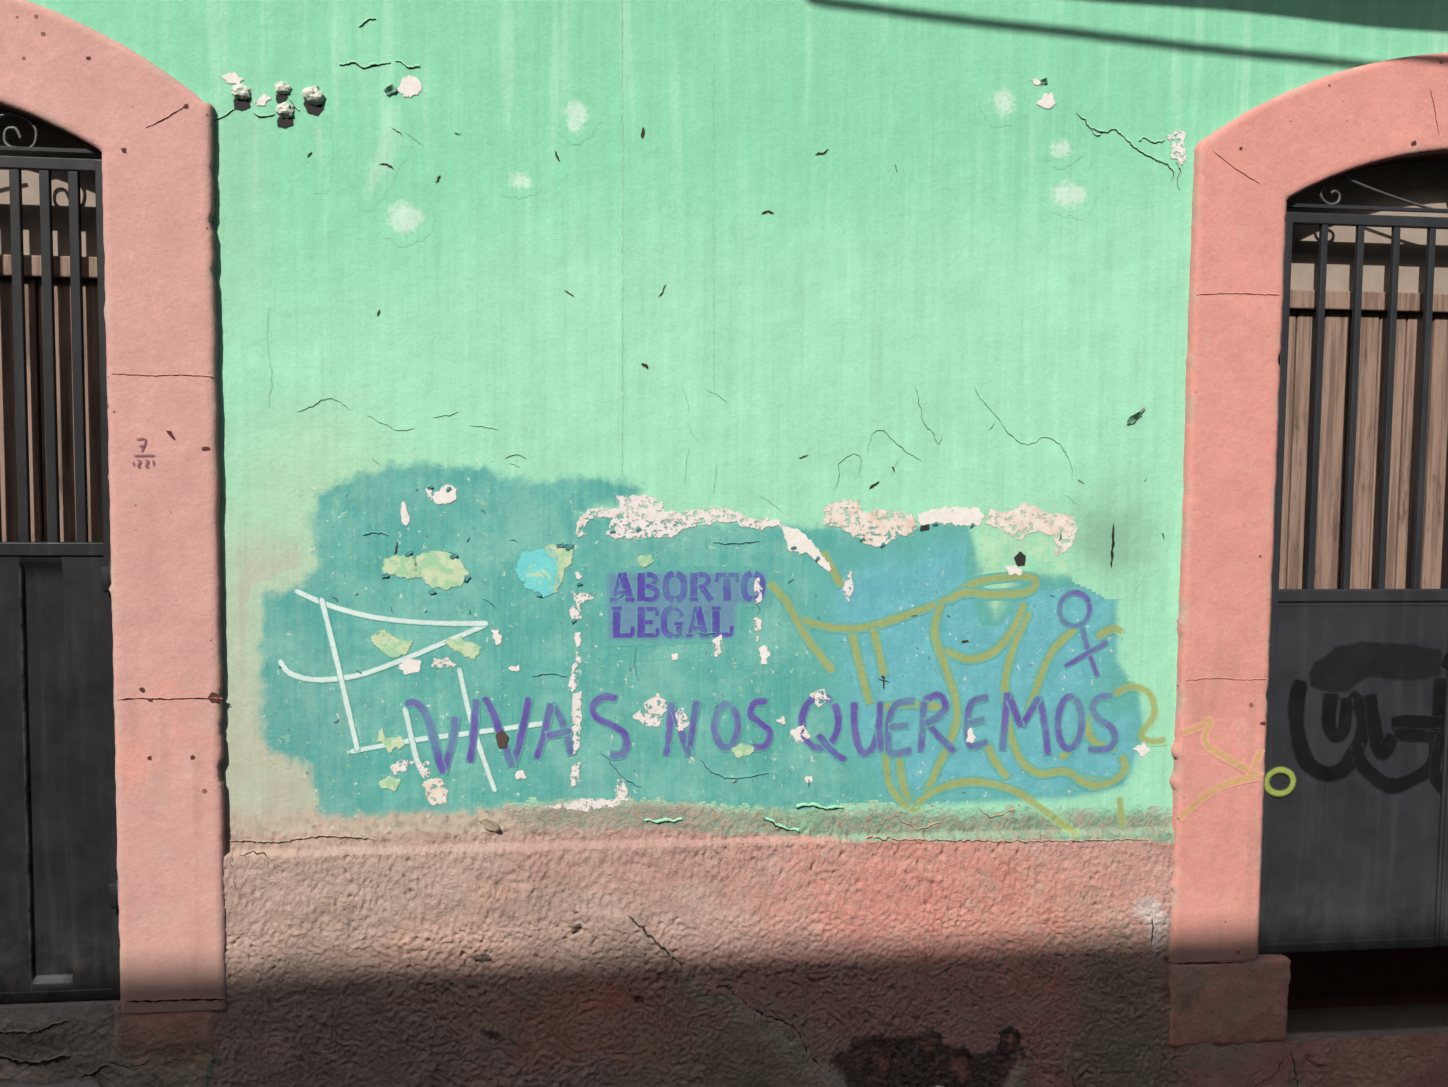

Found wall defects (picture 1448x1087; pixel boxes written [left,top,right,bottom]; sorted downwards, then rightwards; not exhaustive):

crack [1077,112,1182,190]
crack [1214,151,1259,183]
crack [266,306,526,467]
crack [835,386,942,488]
crack [975,386,1076,504]
peeling [401,501,410,525]
peeling [425,485,456,504]
peeling [380,549,471,594]
peeling [371,629,502,675]
spalling [478,494,1173,849]
peeling [376,728,449,805]
crack [0,1019,182,1078]